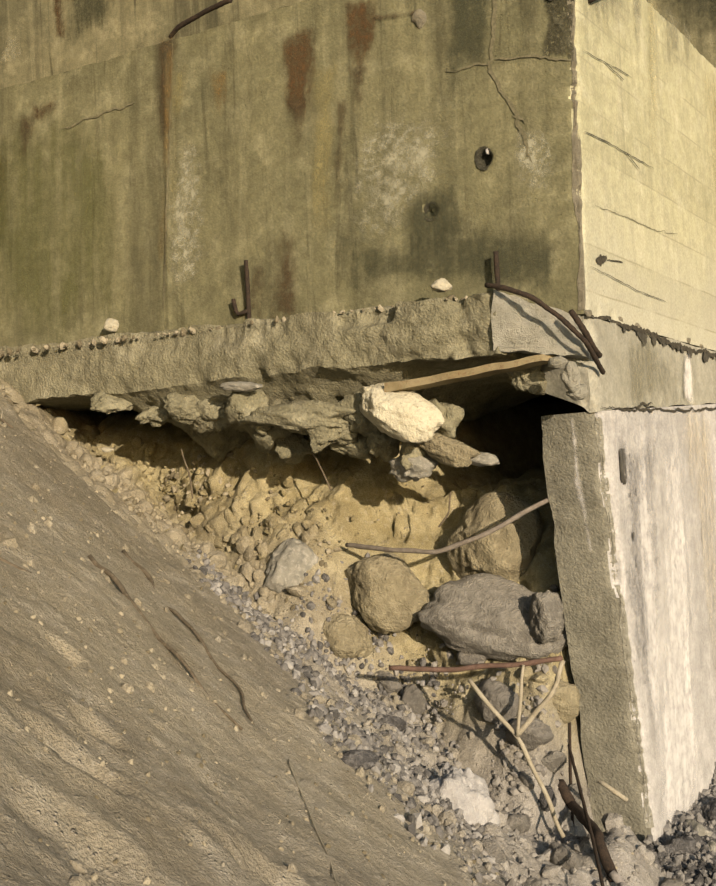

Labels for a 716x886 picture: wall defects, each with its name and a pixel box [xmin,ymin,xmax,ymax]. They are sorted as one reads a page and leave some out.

water stain [74,0,105,33]
rust [284,32,311,123]
crack [445,0,532,162]
crack [591,266,664,301]
crack [585,310,716,363]
crack [602,402,716,413]